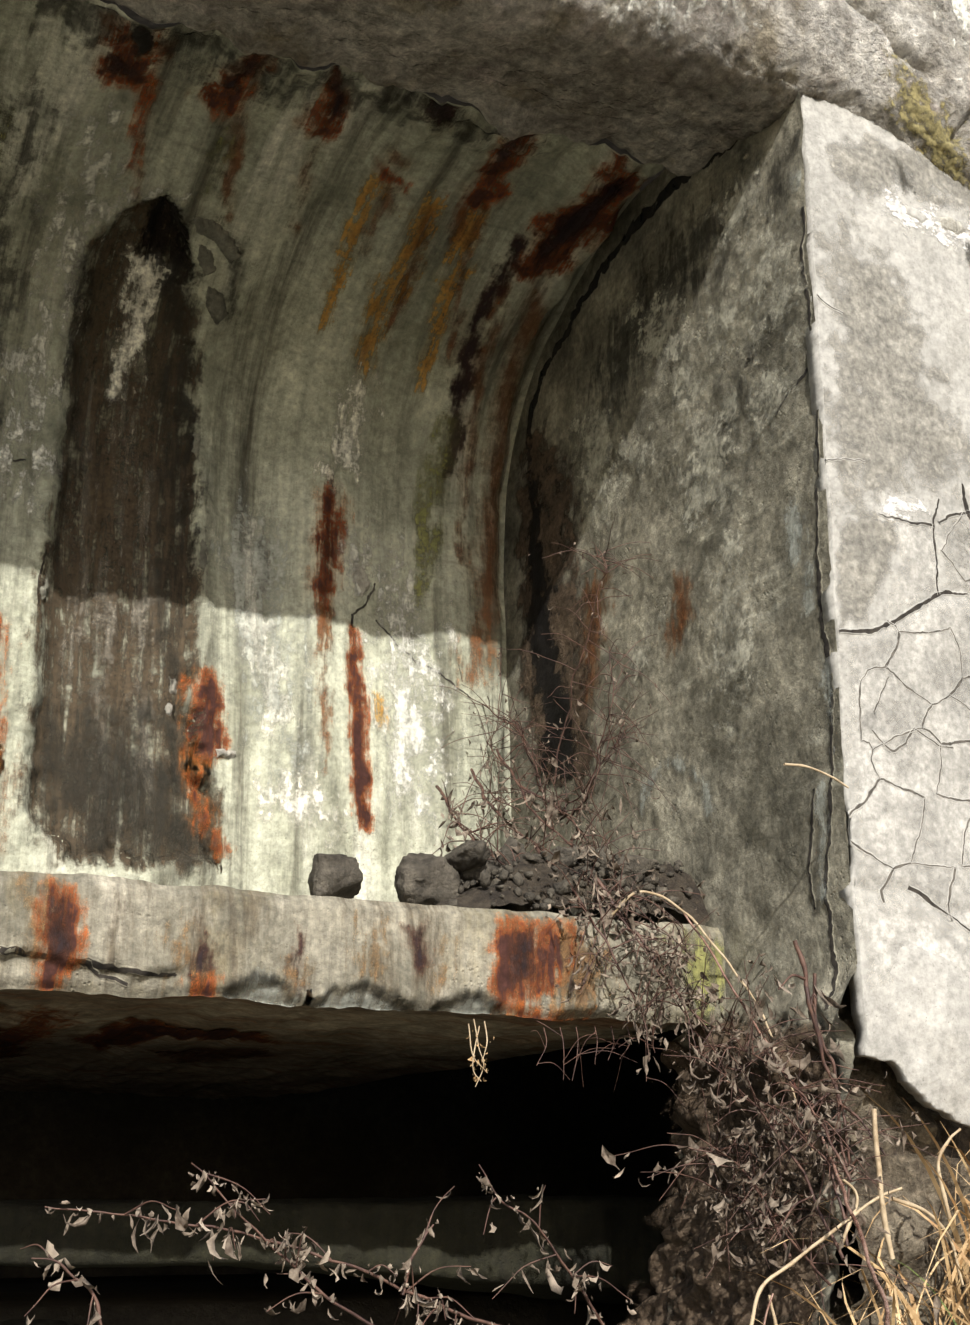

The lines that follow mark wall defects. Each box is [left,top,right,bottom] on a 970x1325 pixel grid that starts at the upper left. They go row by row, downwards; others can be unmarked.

corrosion [93,16,171,210]
corrosion [199,54,276,221]
corrosion [295,66,349,141]
crack [799,206,843,331]
water stain [0,110,306,875]
corrosion [309,134,644,704]
corrosion [164,667,237,860]
corrosion [319,667,333,760]
crack [774,366,970,1010]
crack [0,945,177,988]
corrosion [487,916,611,1021]